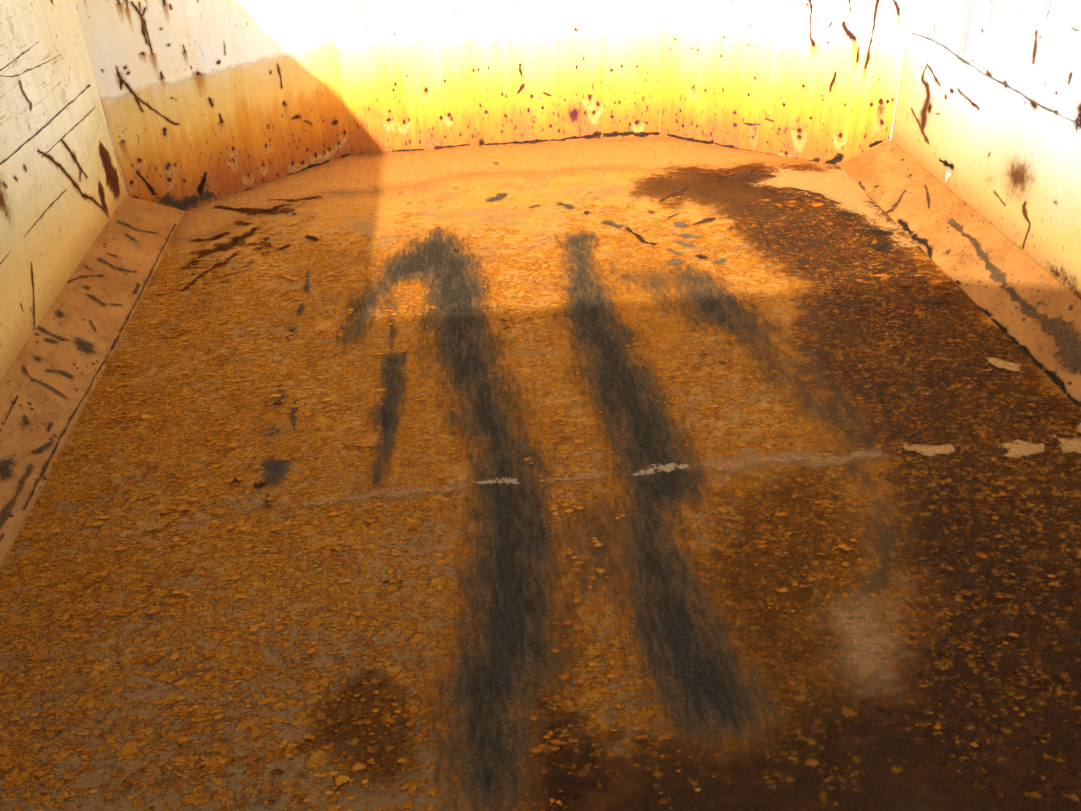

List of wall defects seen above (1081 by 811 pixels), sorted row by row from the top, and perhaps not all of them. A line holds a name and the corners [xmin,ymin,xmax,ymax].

rust [0,25,1081,381]
leakage [0,464,33,530]
leakage [337,163,1081,811]
rust [313,670,413,780]